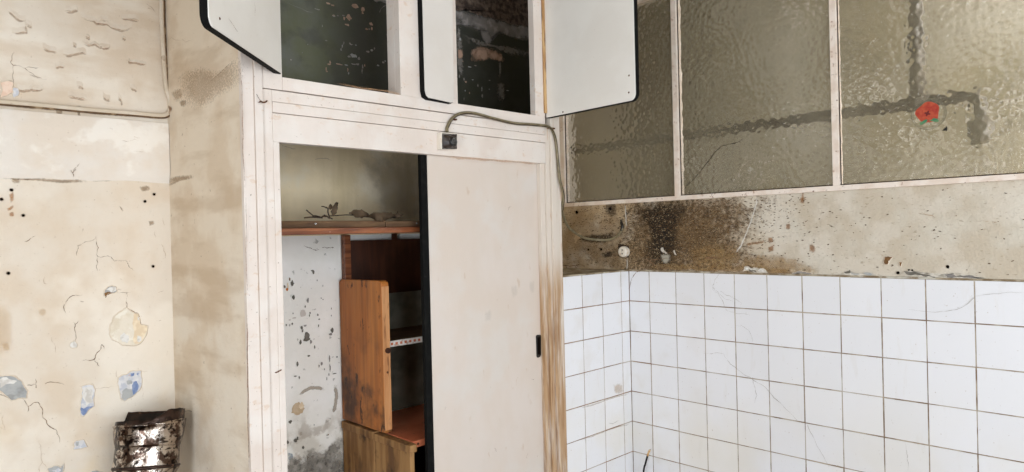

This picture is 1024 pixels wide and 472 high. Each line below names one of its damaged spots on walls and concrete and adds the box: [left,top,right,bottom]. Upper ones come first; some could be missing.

water stain [563,196,817,274]
peeling [0,374,29,401]
crack [0,379,60,466]
crack [55,295,108,388]
peeling [79,383,96,417]
flaking render [109,307,148,346]
peeling [117,370,143,402]
flaking render [284,278,338,424]